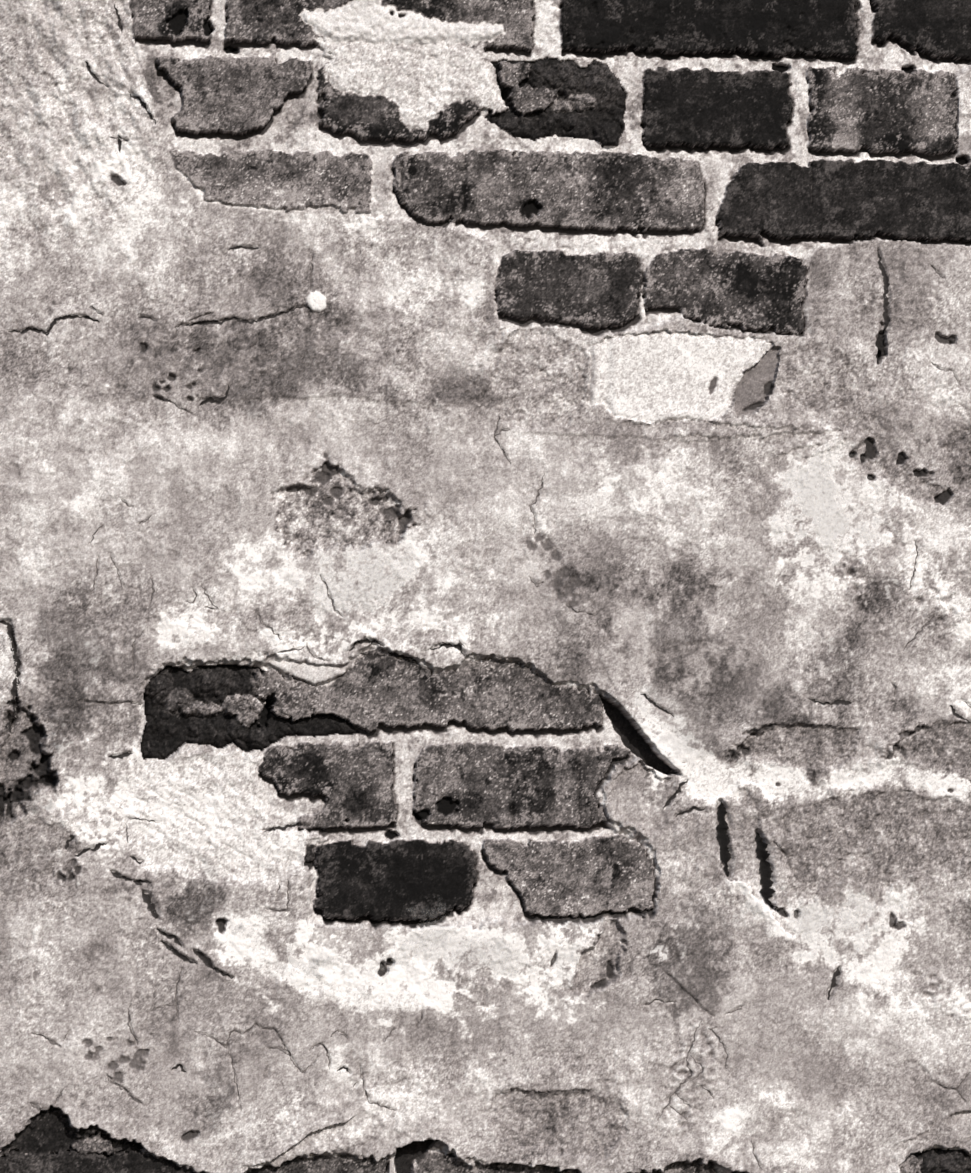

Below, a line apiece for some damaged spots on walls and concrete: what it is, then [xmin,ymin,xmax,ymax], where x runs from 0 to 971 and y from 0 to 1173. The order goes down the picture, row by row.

crack [8,306,103,336]
spalling [122,0,971,506]
crack [877,249,892,337]
spalling [270,457,416,560]
crack [640,693,674,717]
crack [950,697,971,723]
spalling [120,637,688,998]
crack [663,780,786,912]
crack [65,817,394,1110]
spalling [0,1094,220,1173]
spalling [240,1090,629,1173]
spalling [615,1010,752,1173]